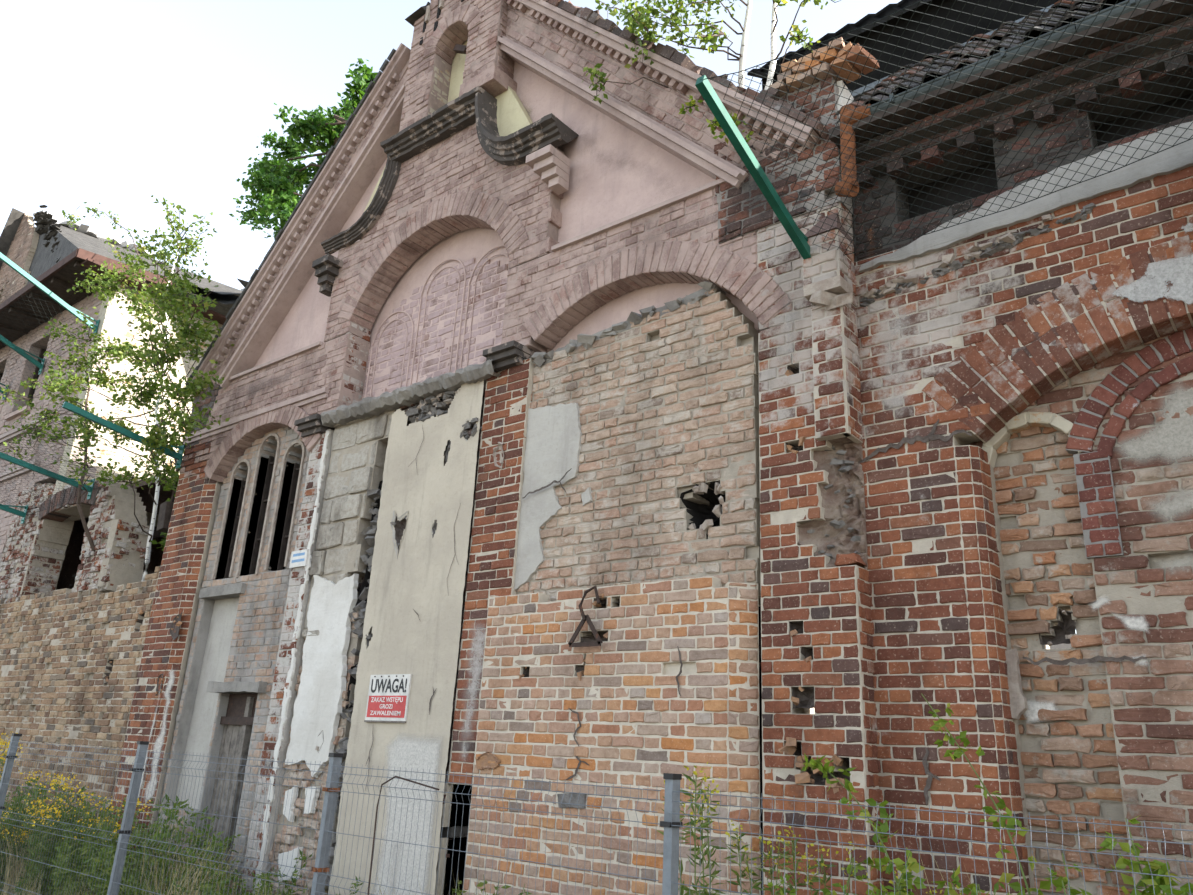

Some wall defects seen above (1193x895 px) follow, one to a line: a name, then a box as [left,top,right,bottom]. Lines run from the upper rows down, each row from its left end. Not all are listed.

spalling [859,203,1096,307]
peeling [1112,254,1193,304]
spalling [405,389,460,423]
peeling [514,403,583,591]
spalling [688,481,725,533]
spalling [786,436,868,570]
spalling [390,510,408,559]
peeling [283,573,359,822]
peeling [278,847,303,882]